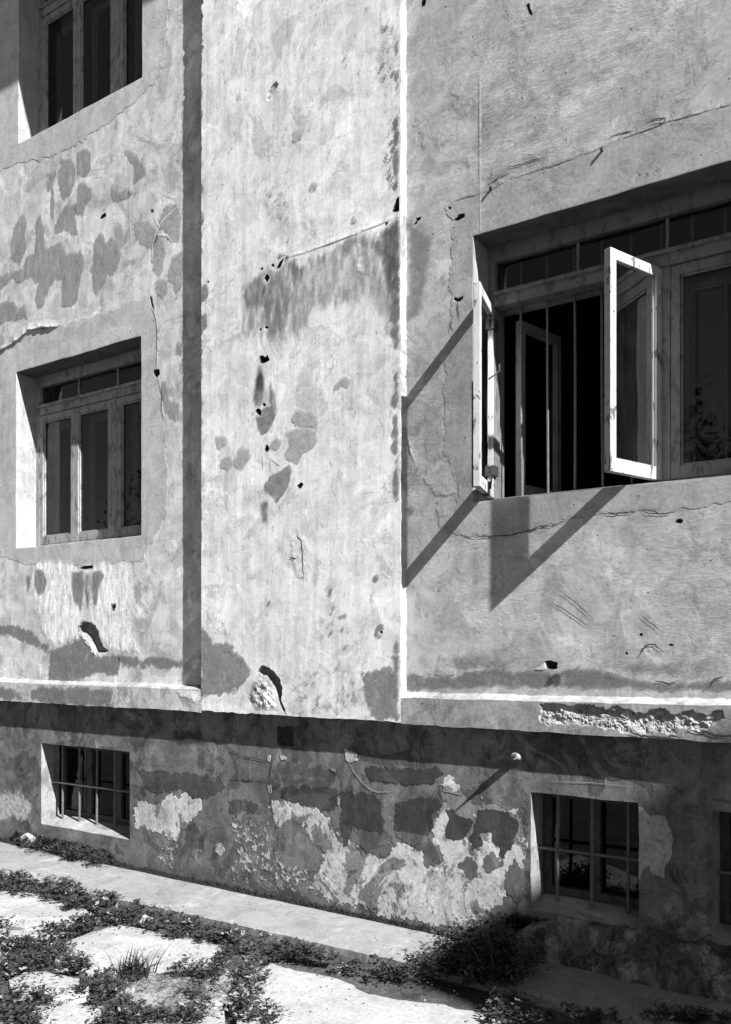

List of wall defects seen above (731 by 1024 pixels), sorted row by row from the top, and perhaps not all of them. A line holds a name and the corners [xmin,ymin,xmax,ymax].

crack [610,117,666,137]
crack [490,158,542,183]
crack [607,508,670,516]
crack [460,517,577,538]
spalling [78,622,108,655]
spalling [535,660,558,670]
spalling [257,665,286,715]
spalling [538,702,726,736]
flaking render [133,748,528,929]